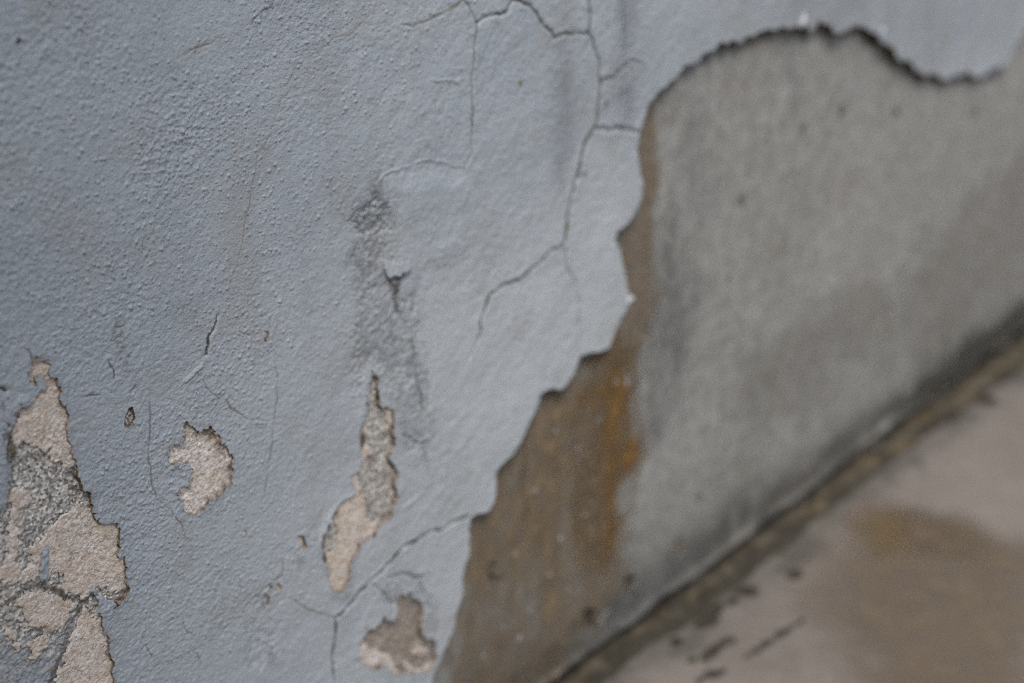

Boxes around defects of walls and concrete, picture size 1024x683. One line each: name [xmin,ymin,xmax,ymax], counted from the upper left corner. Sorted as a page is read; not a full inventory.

crack [422,0,644,347]
peeling [0,356,130,683]
crack [180,317,217,386]
peeling [167,421,234,516]
peeling [321,370,399,593]
crack [311,514,470,681]
damp [457,346,636,683]
spalling [357,13,1024,683]